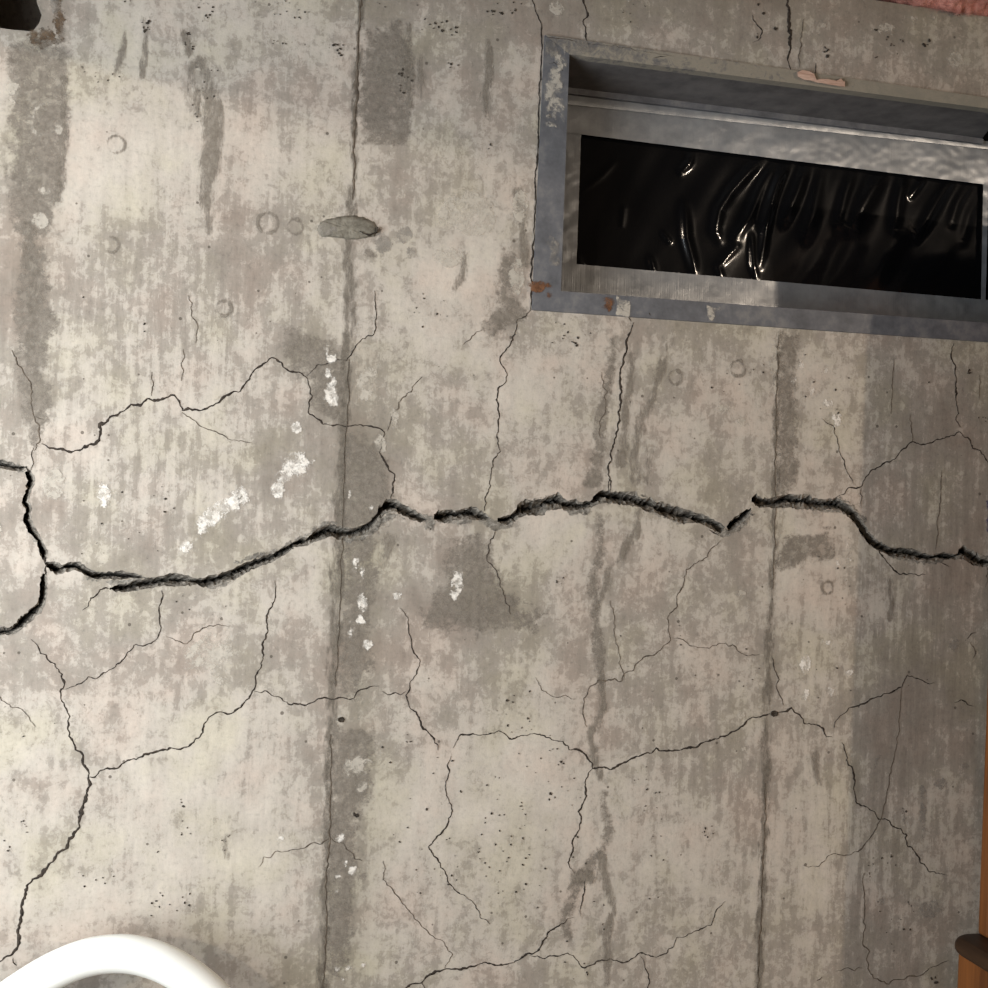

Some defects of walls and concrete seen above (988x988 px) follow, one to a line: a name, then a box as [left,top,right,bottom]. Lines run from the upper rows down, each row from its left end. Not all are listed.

damp [7,39,69,444]
damp [358,20,424,146]
crack [530,0,543,283]
crack [786,0,816,73]
damp [424,535,538,631]
crack [0,290,988,988]